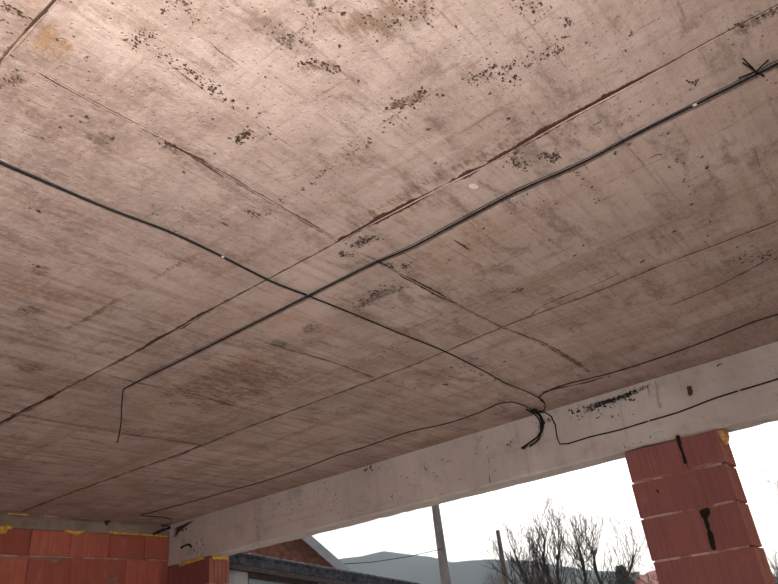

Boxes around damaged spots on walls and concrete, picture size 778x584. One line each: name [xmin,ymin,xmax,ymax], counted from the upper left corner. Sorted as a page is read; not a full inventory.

damp [263,0,434,49]
damp [123,30,235,108]
damp [292,58,341,74]
damp [462,17,574,89]
damp [227,125,254,145]
damp [383,86,445,118]
rust [451,70,656,180]
damp [568,385,649,420]